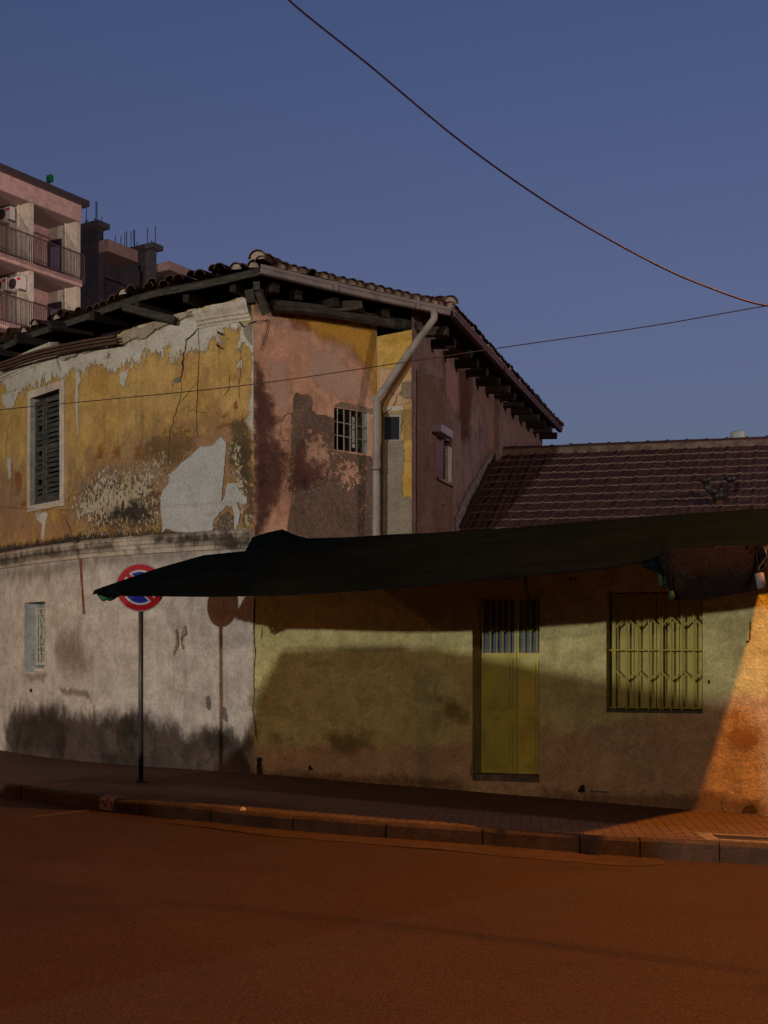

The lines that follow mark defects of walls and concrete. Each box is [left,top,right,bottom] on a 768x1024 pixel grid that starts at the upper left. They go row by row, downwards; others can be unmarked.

peeling [2,297,257,442]
damp [0,361,289,553]
crack [168,328,241,464]
damp [5,704,462,790]